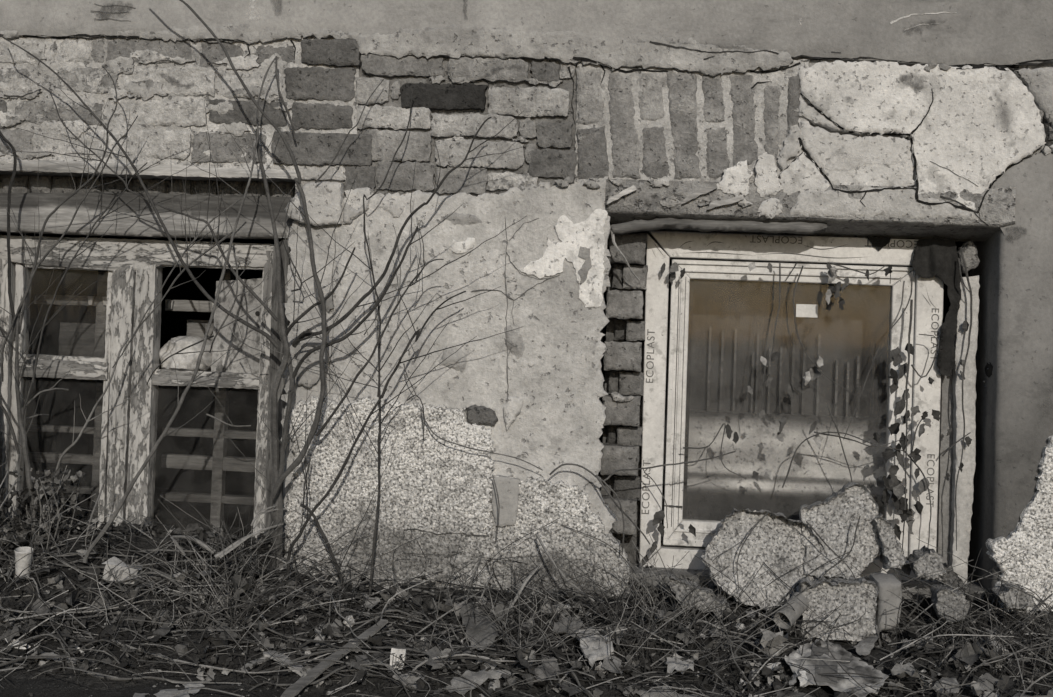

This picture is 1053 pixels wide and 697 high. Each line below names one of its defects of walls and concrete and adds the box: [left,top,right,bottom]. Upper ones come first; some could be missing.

crack [567,41,928,123]
crack [956,59,1053,76]
flaking render [0,38,622,308]
crack [781,91,1033,226]
peeling [647,60,1053,538]
peeling [296,339,328,388]
spalling [466,396,524,430]
spalling [492,475,520,527]